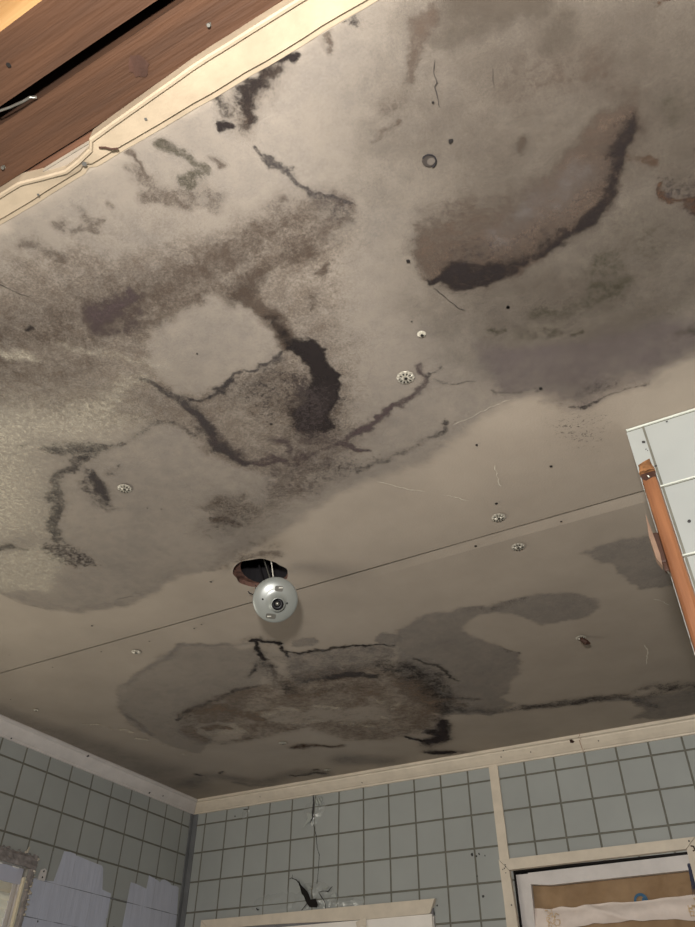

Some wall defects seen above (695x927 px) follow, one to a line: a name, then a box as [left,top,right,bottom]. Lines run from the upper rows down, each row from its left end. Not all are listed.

damp [216,52,301,132]
damp [413,104,638,291]
damp [44,139,431,494]
damp [40,442,123,566]
damp [175,634,466,755]
damp [510,688,670,717]